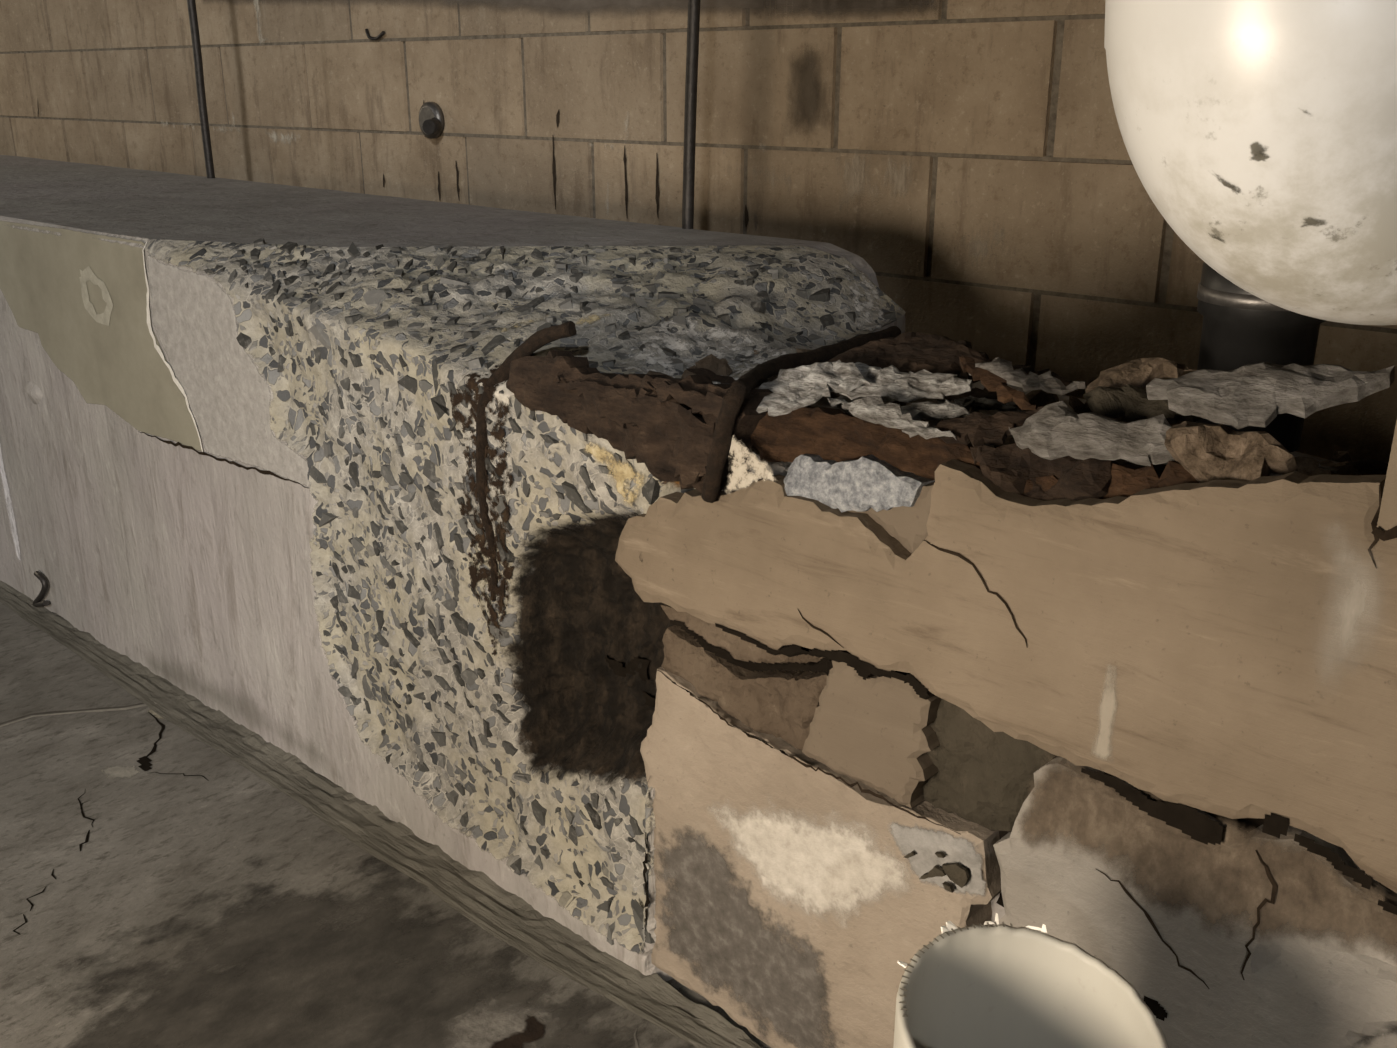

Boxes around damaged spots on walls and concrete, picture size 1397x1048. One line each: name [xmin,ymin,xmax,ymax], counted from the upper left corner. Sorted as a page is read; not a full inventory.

crack [140,432,310,489]
rust [450,350,732,656]
rust [721,389,1199,501]
spalling [0,221,1397,954]
crack [670,610,935,700]
crack [923,540,1028,648]
crack [133,712,207,780]
crack [13,793,94,935]
damp [70,856,659,1048]
damp [659,808,905,1048]
crack [996,893,1004,907]
crack [1081,768,1397,989]